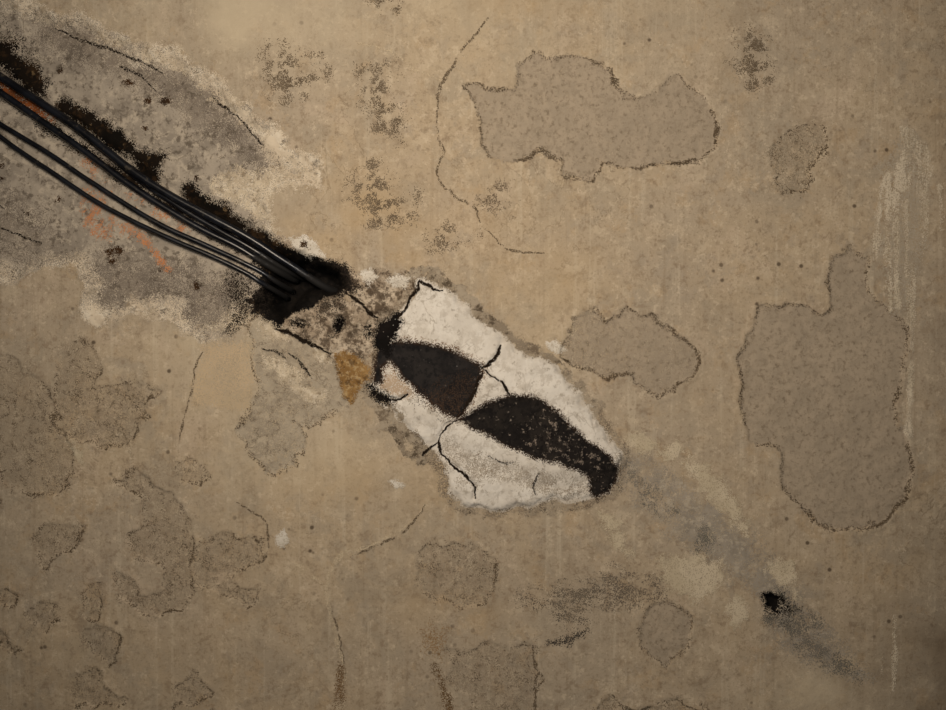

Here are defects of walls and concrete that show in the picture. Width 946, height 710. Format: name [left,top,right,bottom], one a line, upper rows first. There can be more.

crack [358,21,544,254]
peeling [763,118,831,199]
crack [262,328,332,379]
spalling [0,0,754,561]
crack [342,279,443,319]
crack [422,345,510,499]